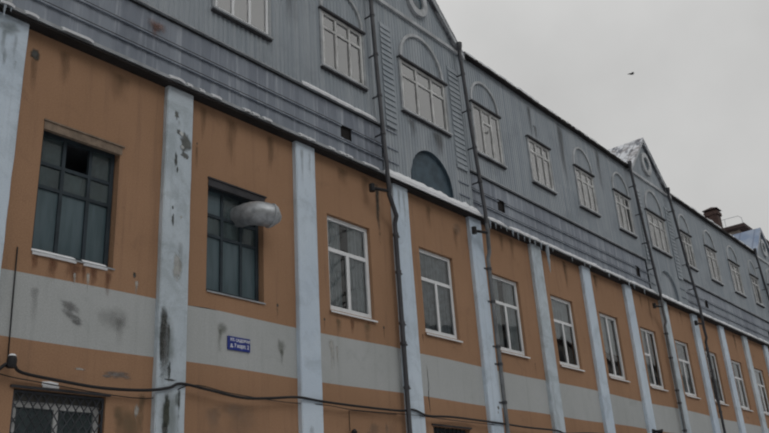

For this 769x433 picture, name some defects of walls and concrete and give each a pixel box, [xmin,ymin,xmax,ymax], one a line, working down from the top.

spalling [175,129,191,172]